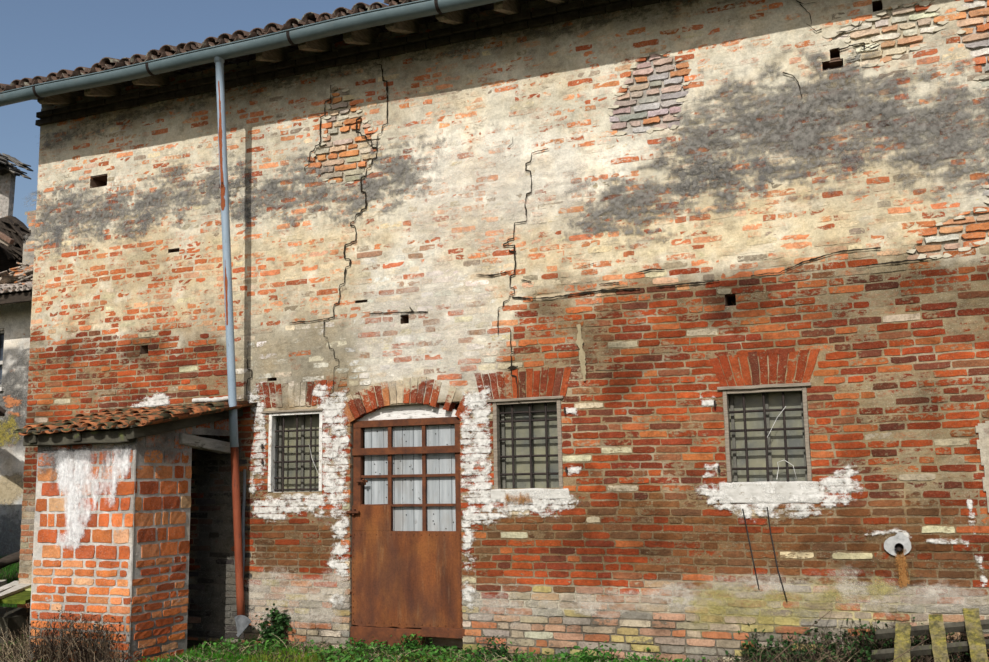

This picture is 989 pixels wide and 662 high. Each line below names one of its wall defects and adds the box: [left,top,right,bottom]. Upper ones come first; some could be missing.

leakage [25,134,447,258]
crack [290,64,388,397]
spalling [304,89,382,185]
crack [478,139,719,404]
spalling [607,51,691,136]
leakage [566,48,989,241]
crack [751,247,937,277]
spalling [822,0,989,89]
leakage [42,446,130,549]
peeling [248,384,349,579]
peeling [460,386,578,569]
peeling [697,464,861,518]